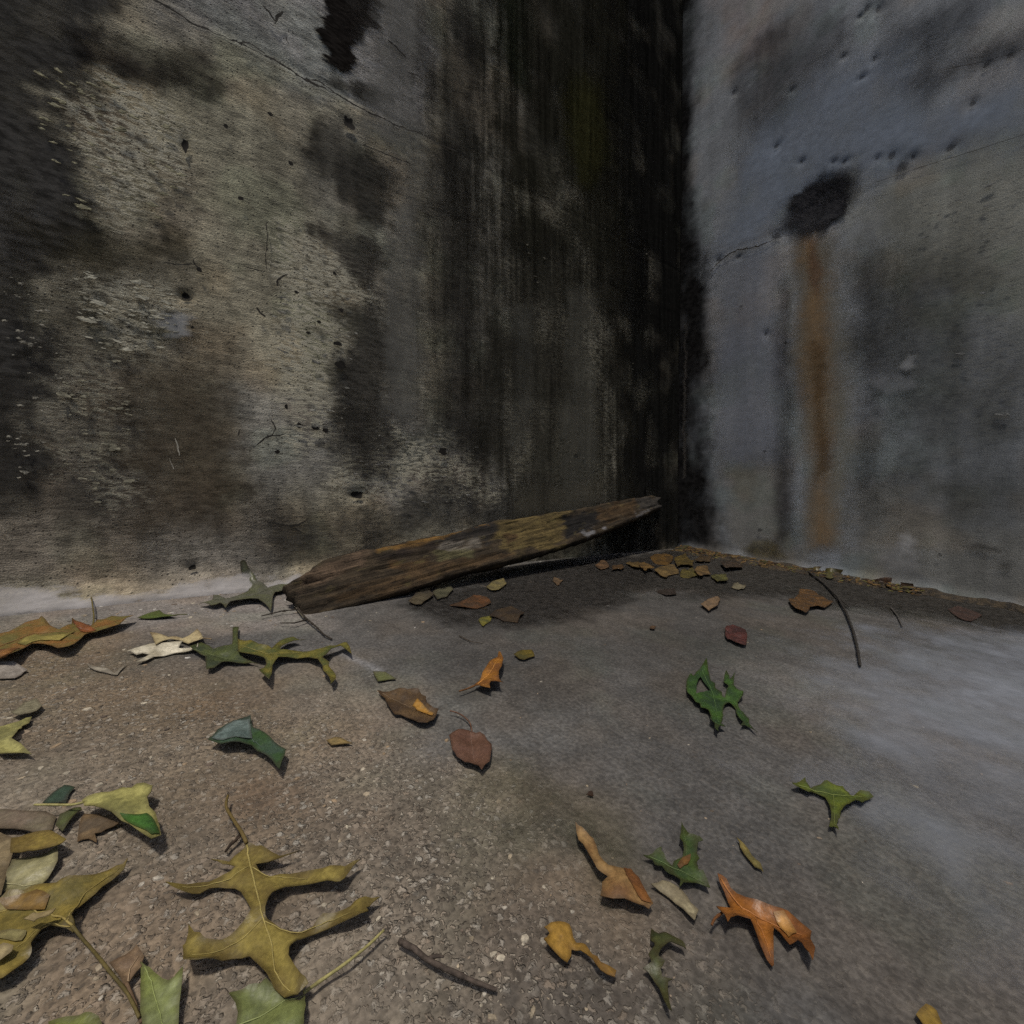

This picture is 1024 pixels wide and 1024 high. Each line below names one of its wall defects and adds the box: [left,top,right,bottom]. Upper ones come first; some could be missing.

crack [263,6,288,42]
damp [315,0,386,102]
damp [298,121,395,226]
damp [728,66,1017,249]
damp [305,222,390,289]
damp [424,0,632,519]
crack [710,240,772,272]
damp [323,302,398,467]